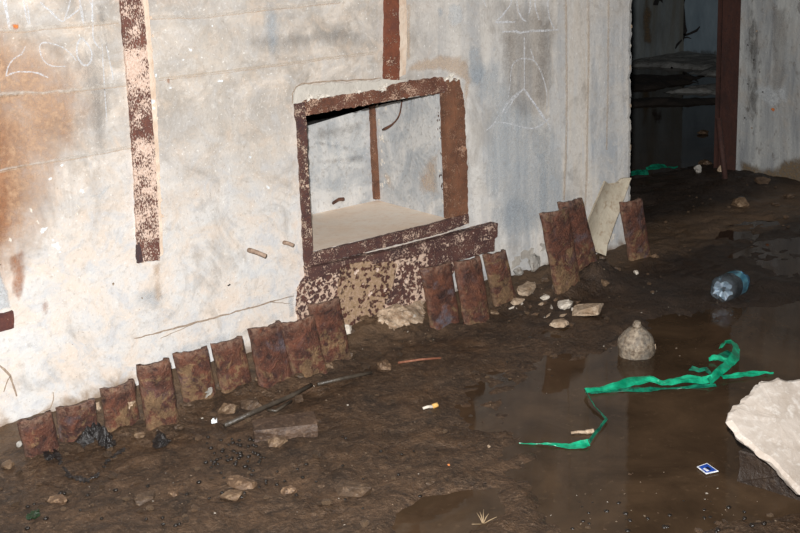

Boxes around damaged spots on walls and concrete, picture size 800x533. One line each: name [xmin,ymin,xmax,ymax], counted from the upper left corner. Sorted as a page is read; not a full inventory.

corrosion [0,49,71,232]